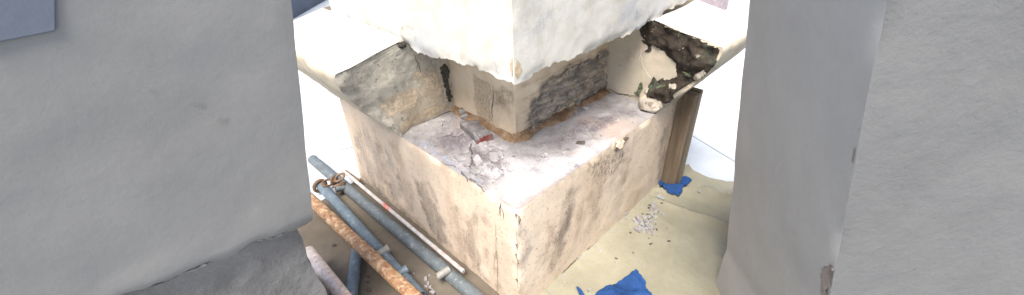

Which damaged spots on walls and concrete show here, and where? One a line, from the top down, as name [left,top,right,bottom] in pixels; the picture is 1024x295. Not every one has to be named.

spalling [510,49,609,132]
peeling [634,21,723,113]
peeling [443,143,504,189]
spalling [820,265,835,295]